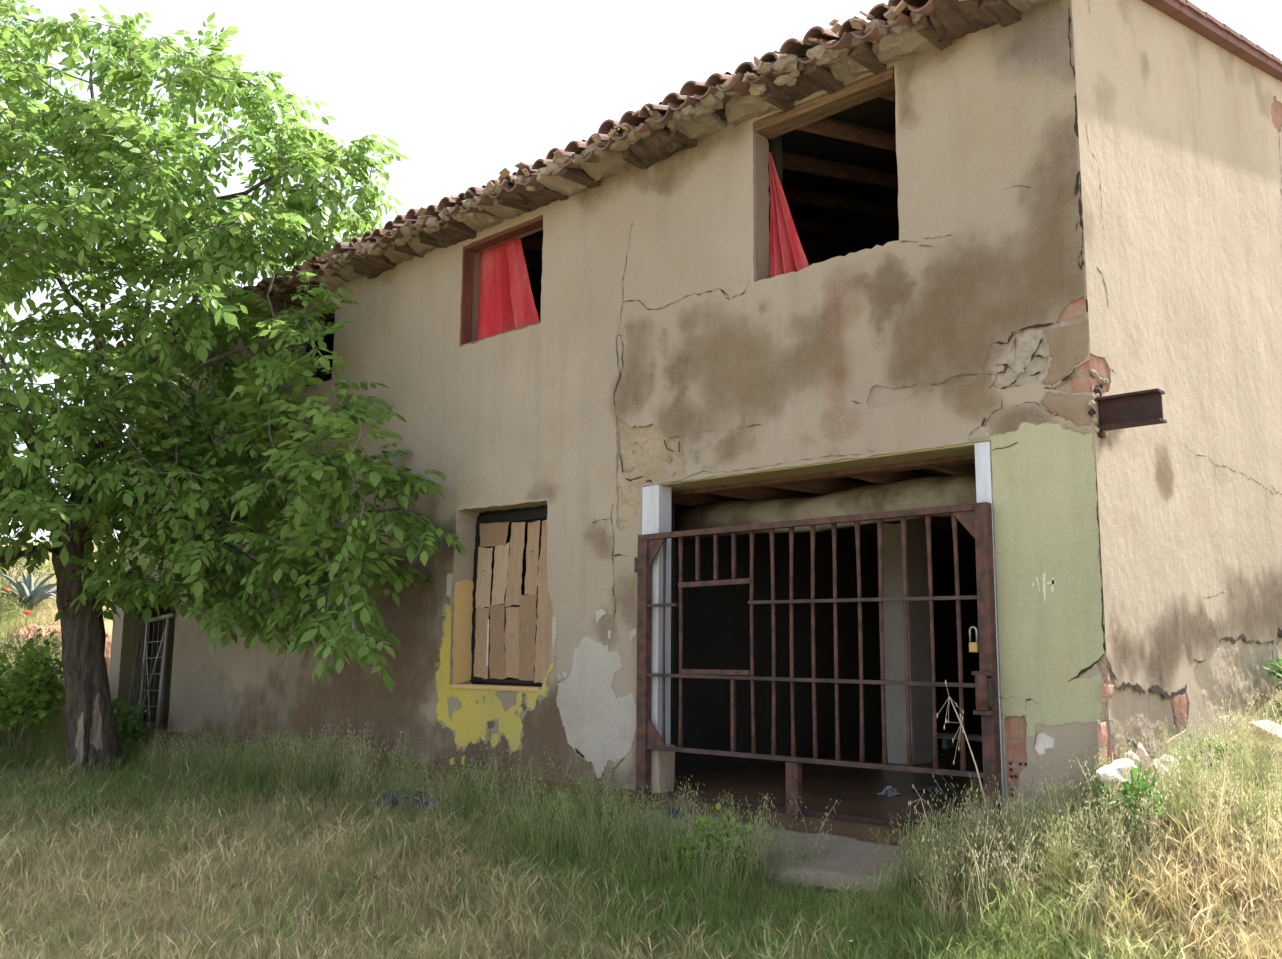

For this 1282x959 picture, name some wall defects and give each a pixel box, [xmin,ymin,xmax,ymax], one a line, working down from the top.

crack [1068,0,1109,308]
crack [613,225,749,409]
leakage [898,152,1081,409]
crack [914,323,1076,451]
flaking render [992,328,1049,389]
leakage [1001,412,1040,431]
flaking render [1055,355,1109,438]
peeling [435,573,637,778]
leakage [1115,608,1223,683]
crack [1068,439,1282,759]
leakage [1240,580,1282,640]
flaking render [1005,716,1054,812]